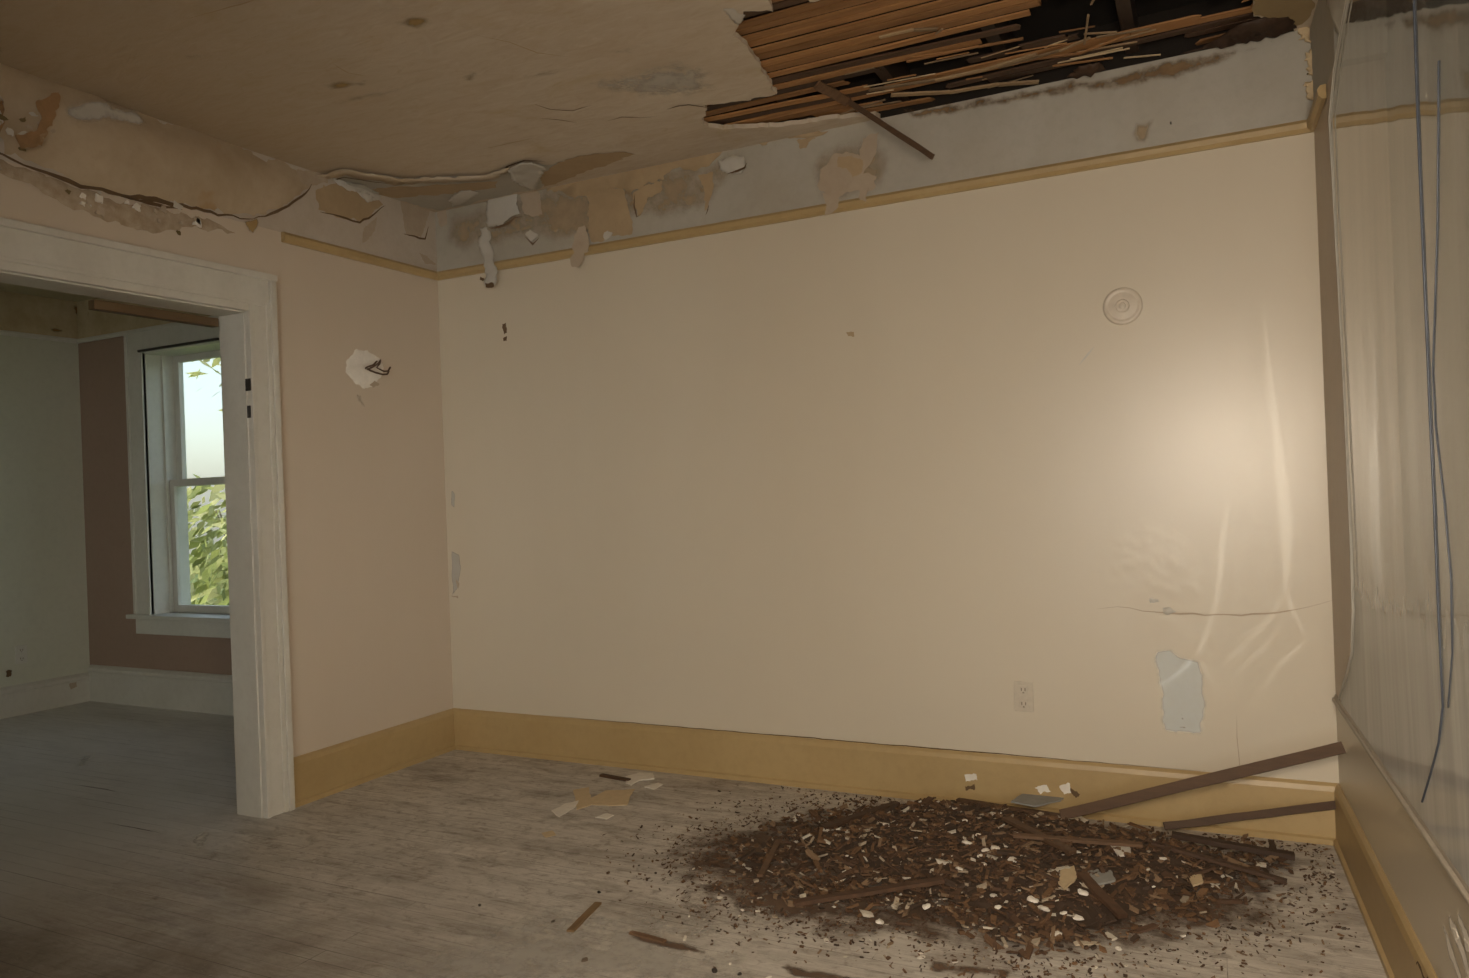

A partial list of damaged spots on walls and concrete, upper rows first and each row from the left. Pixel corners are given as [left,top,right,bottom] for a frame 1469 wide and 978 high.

peeling [1252,0,1315,100]
flaking render [0,92,234,235]
peeling [297,152,635,288]
spalling [346,349,391,389]
peeling [1444,915,1469,978]